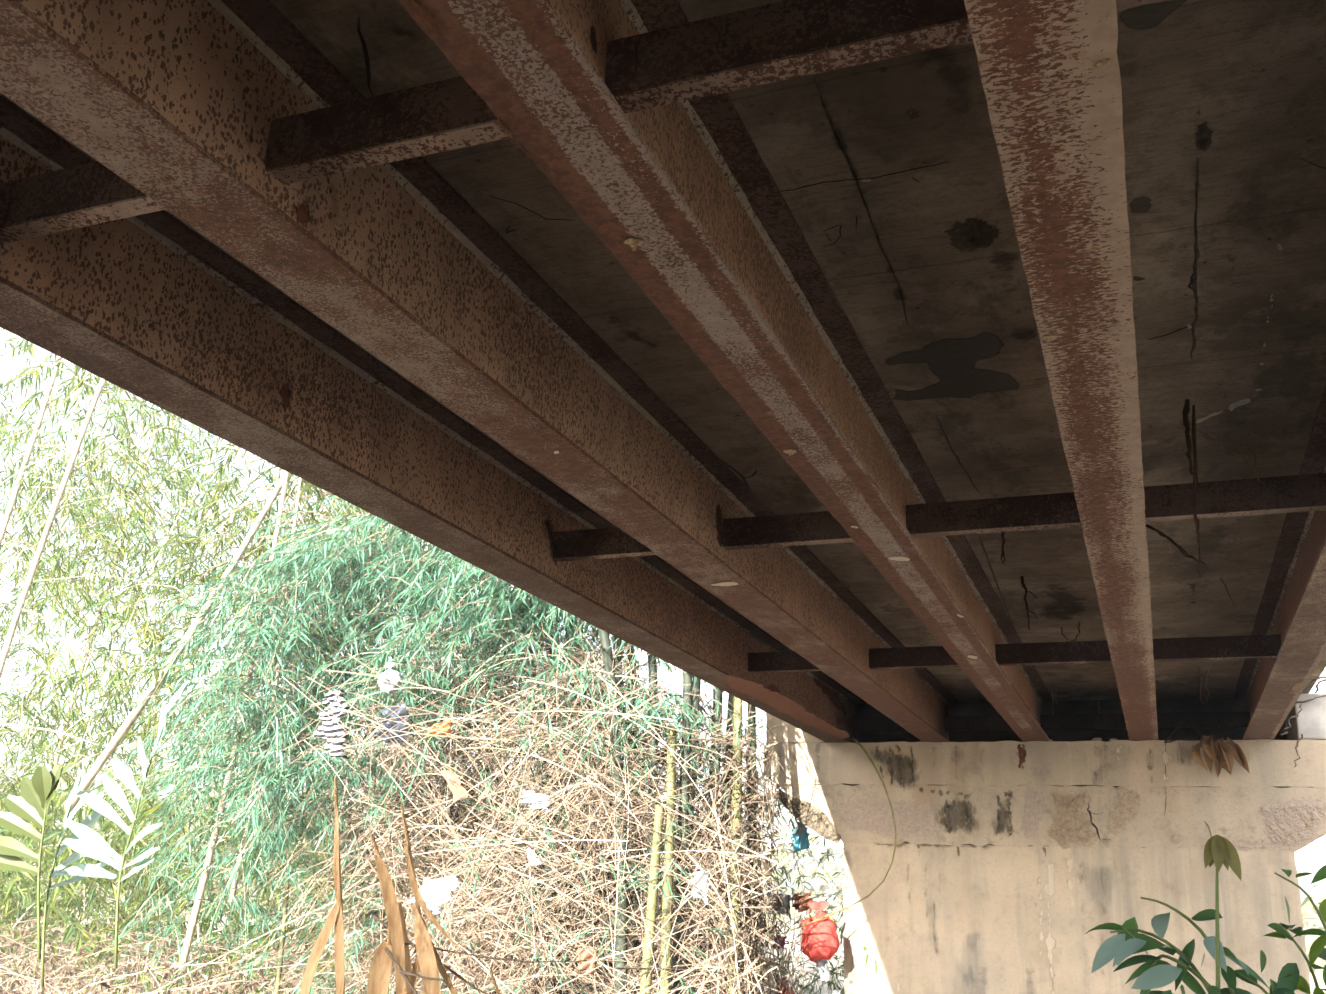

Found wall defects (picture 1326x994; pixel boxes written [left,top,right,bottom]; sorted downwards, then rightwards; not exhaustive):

crack [781,161,948,191]
crack [1148,157,1200,360]
damp [886,330,1034,401]
spalling [1048,789,1141,849]
spalling [1232,798,1326,852]